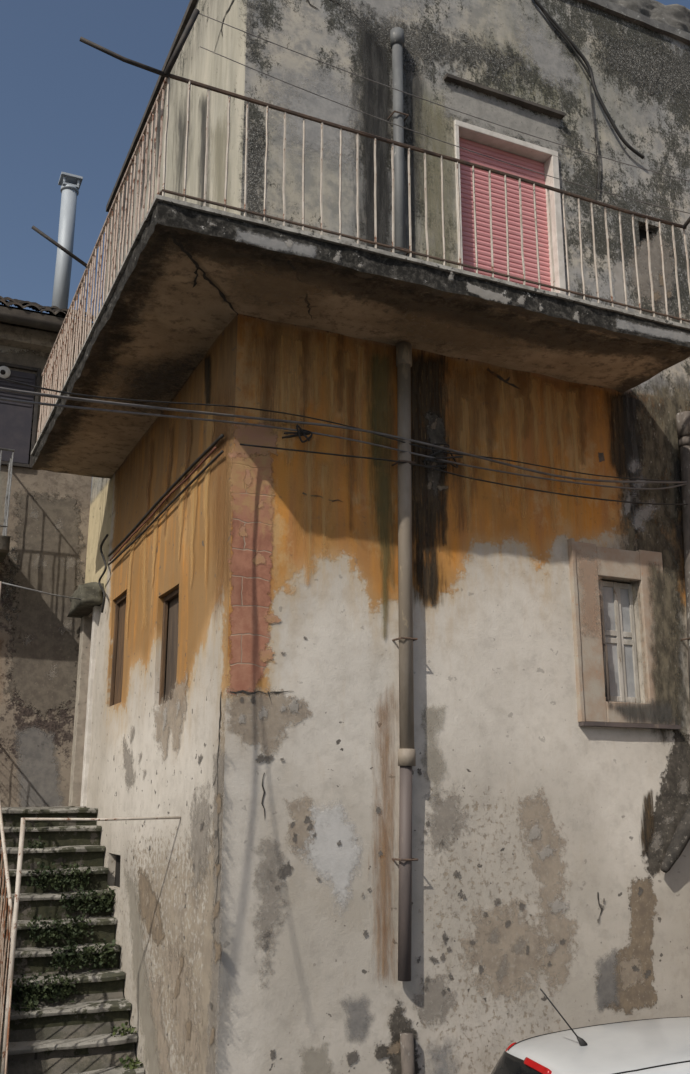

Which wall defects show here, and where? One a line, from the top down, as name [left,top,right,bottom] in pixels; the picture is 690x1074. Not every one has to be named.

leakage [352,23,391,251]
leakage [405,59,427,258]
crack [171,236,238,316]
leakage [127,509,159,629]
spalling [227,421,312,763]
leakage [279,335,394,638]
leakage [36,227,690,605]
leakage [17,728,63,807]
flaking render [253,796,316,985]
flaking render [375,791,577,1074]
spalling [596,729,690,1014]
spalling [346,1051,360,1066]